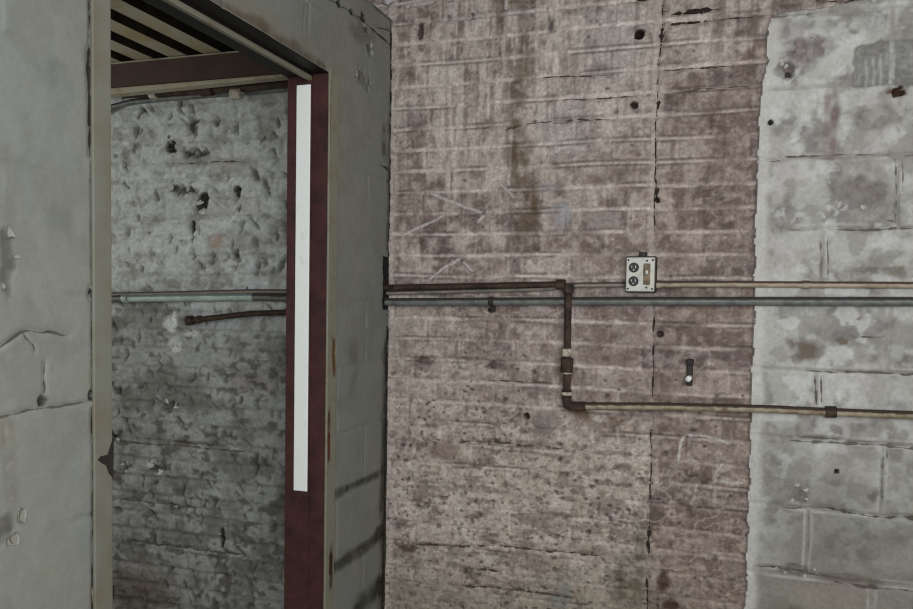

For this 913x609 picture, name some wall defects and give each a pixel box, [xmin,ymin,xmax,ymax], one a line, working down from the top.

crack [84,48,92,156]
crack [505,75,631,130]
crack [636,0,752,239]
crack [0,279,206,536]
crack [649,306,657,398]
crack [644,430,652,609]